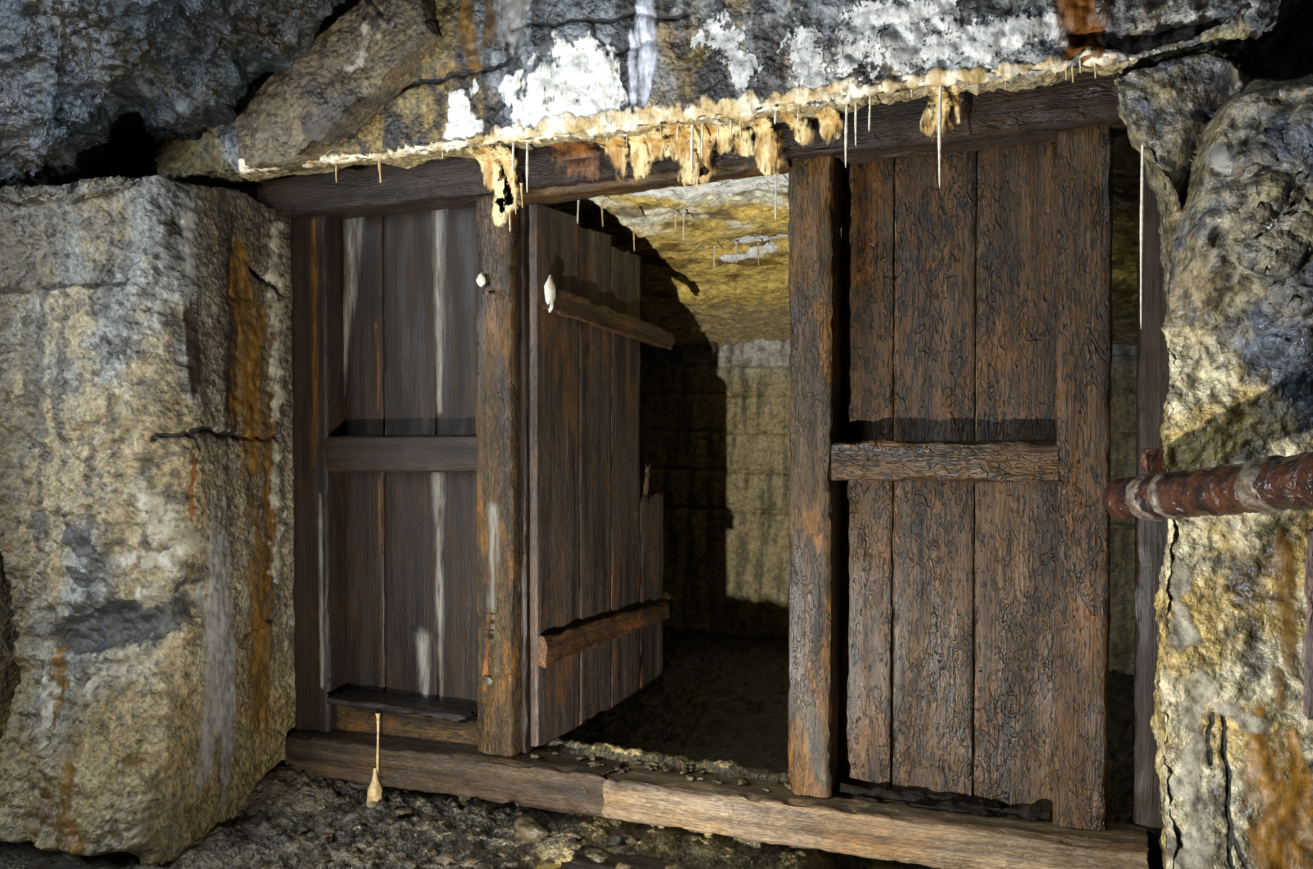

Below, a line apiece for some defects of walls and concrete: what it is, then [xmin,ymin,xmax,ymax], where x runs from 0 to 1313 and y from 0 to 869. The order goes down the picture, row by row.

leakage [444,79,484,145]
leakage [498,0,656,138]
leakage [690,5,764,92]
leakage [777,0,1070,108]
rust [1054,0,1106,70]
crack [150,426,276,453]
rust [229,239,276,742]
leakage [197,498,235,790]
rust [1246,532,1313,869]
crack [1205,712,1248,869]